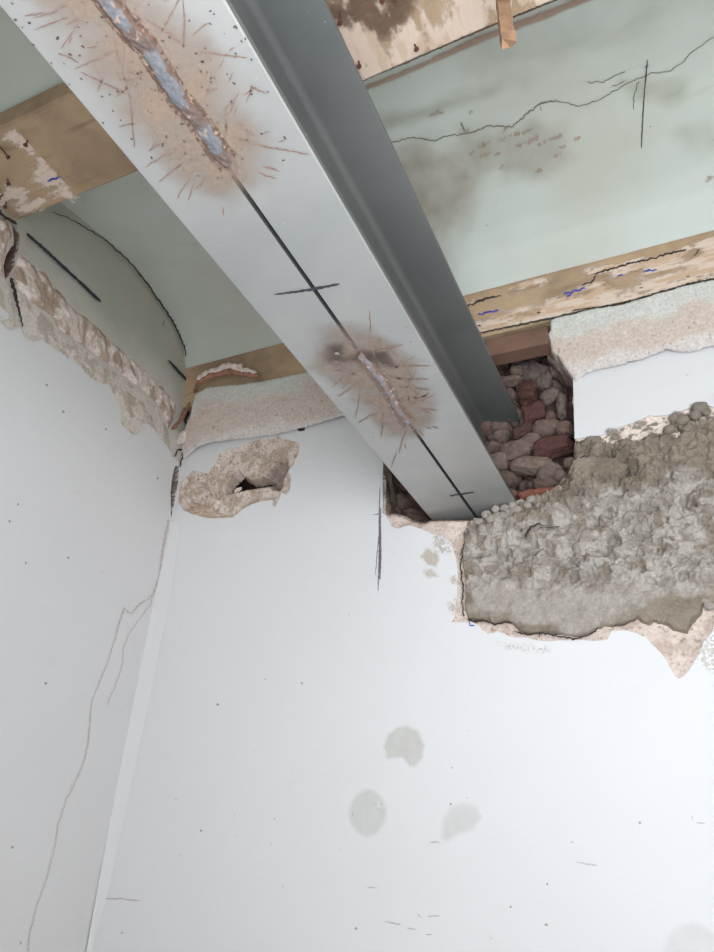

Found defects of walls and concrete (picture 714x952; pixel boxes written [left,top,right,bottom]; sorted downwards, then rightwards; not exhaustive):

crack [391,37,714,143]
spalling [0,129,186,456]
peeling [475,236,714,332]
spalling [179,435,300,518]
spalling [481,355,585,501]
peeling [600,415,681,444]
spalling [383,463,714,679]
crack [28,449,183,952]